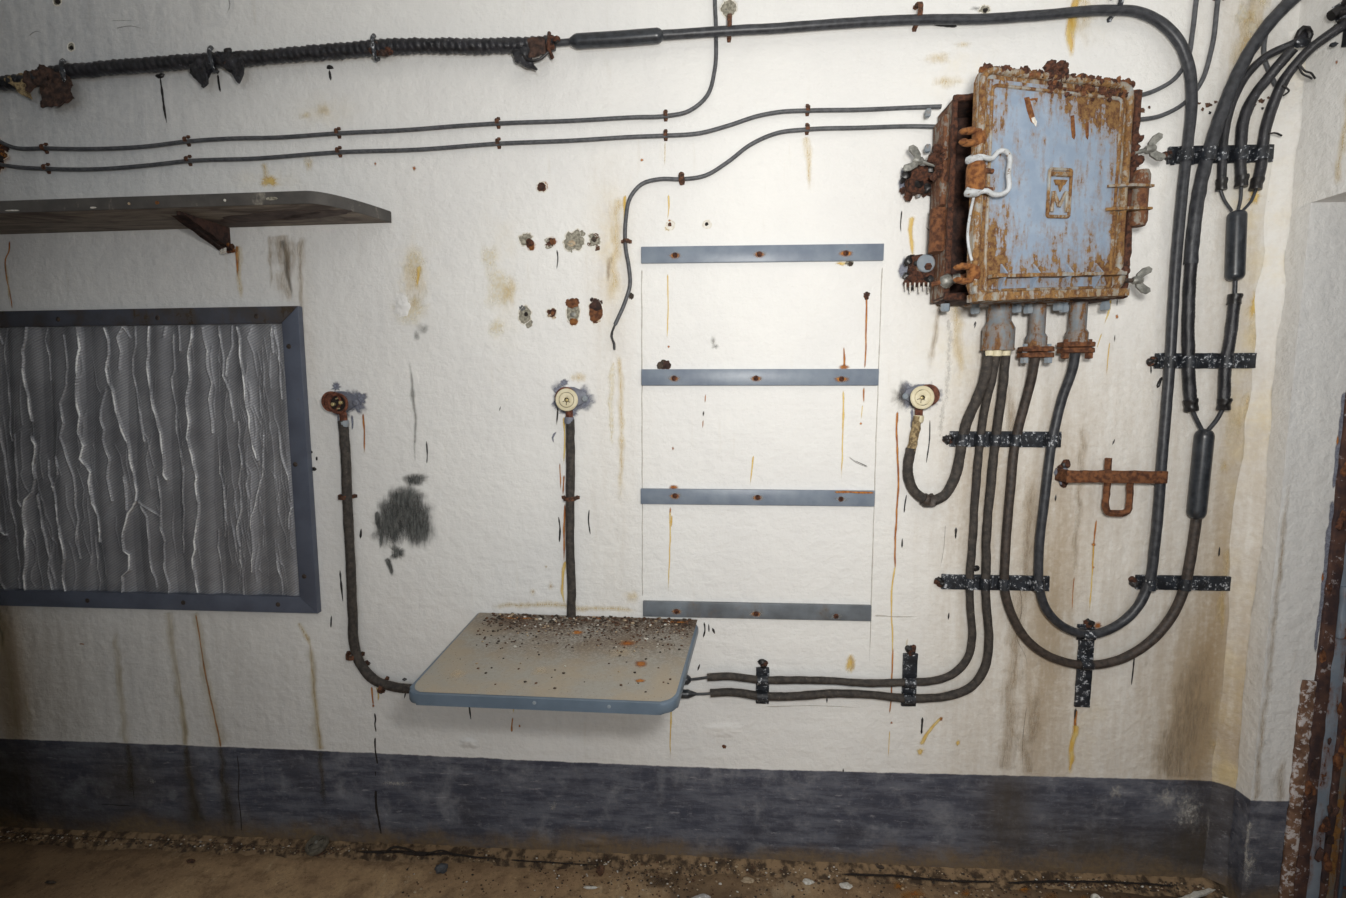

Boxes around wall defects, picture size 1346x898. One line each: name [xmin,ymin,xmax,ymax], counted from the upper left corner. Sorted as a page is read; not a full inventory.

leakage [1067,0,1079,50]
spalling [518,228,602,253]
spalling [518,296,604,328]
leakage [375,512,393,574]
rust [1319,649,1328,669]
rust [1302,702,1346,884]